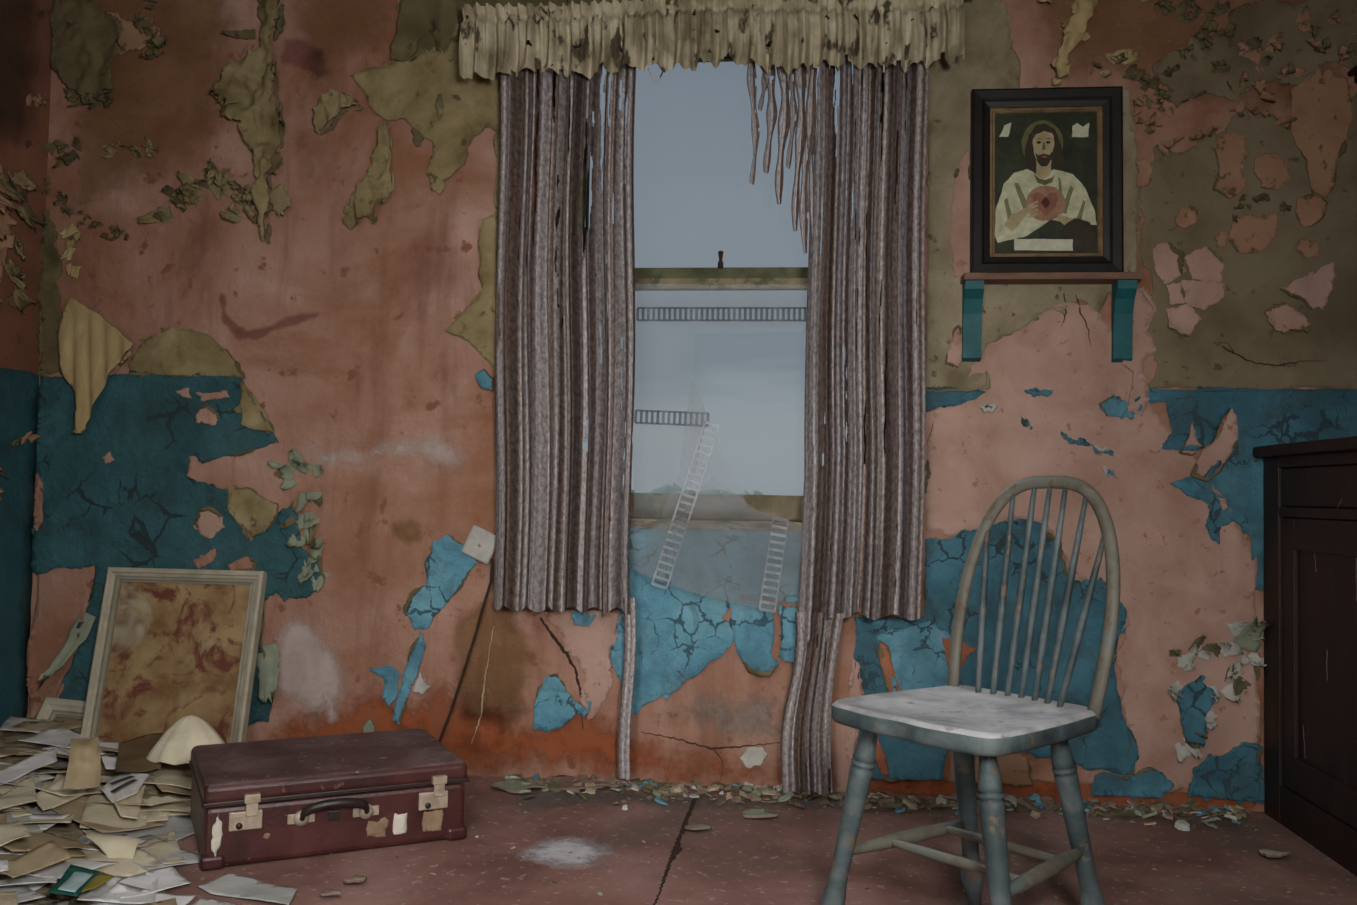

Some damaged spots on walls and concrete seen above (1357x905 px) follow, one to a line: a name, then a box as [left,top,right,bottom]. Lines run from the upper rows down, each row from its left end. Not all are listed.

peeling [312,0,643,391]
peeling [0,106,328,727]
peeling [848,0,1357,805]
peeling [369,534,478,725]
damp [277,601,724,780]
crack [540,617,583,730]
peeling [533,528,802,733]
crack [653,798,697,905]
damp [526,788,842,810]
crack [641,731,780,776]
peeling [740,746,767,768]
peeling [845,726,862,771]